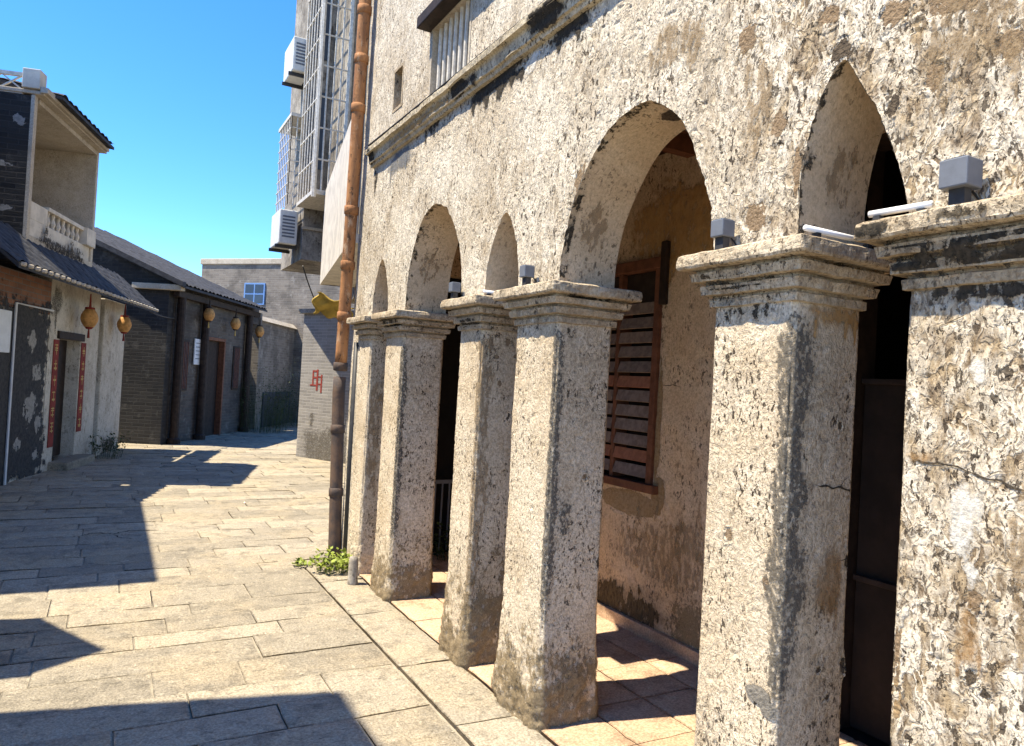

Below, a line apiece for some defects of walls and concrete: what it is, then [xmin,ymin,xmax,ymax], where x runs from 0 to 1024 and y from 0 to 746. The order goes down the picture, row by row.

damp [526,0,589,53]
peeling [0,279,53,486]
crack [819,478,850,492]
crack [908,456,1024,491]
damp [597,500,705,629]